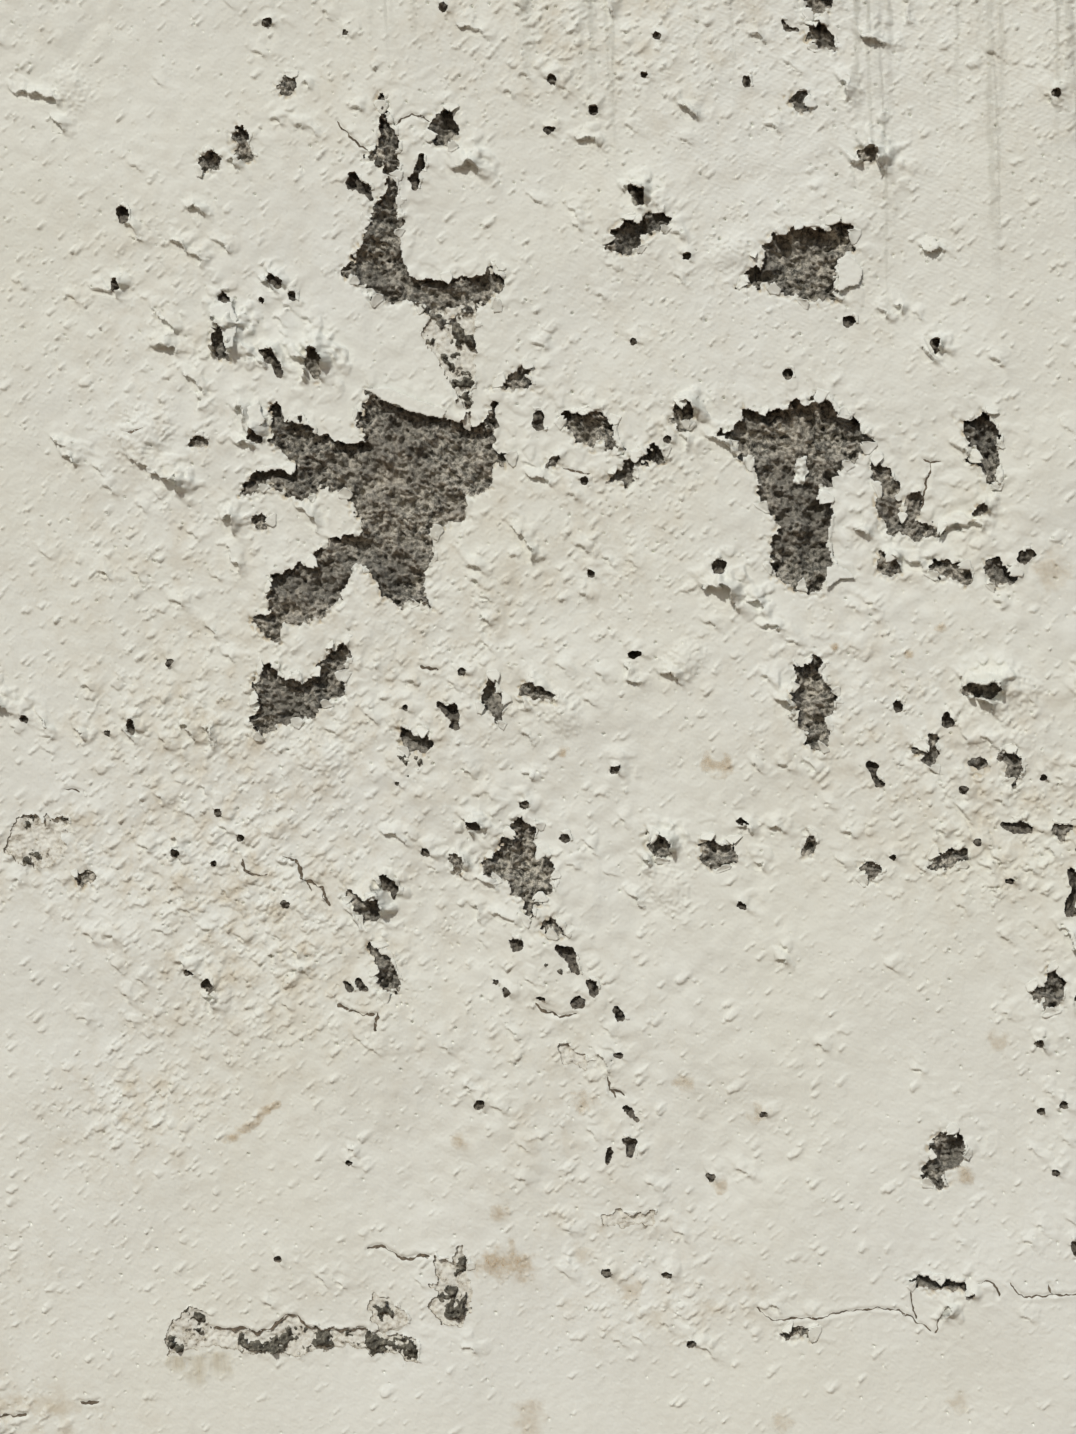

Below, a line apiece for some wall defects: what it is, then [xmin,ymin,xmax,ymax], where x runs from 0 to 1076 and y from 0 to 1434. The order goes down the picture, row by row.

spalling [186,94,898,643]
spalling [933,406,1006,536]
spalling [203,618,354,742]
peeling [441,659,576,745]
spalling [697,556,844,773]
peeling [943,670,1076,872]
spalling [380,766,601,989]
peeling [626,814,790,909]
peeling [1025,918,1076,1055]
spalling [921,1122,973,1190]
peeling [164,1292,422,1363]
peeling [426,1245,484,1354]